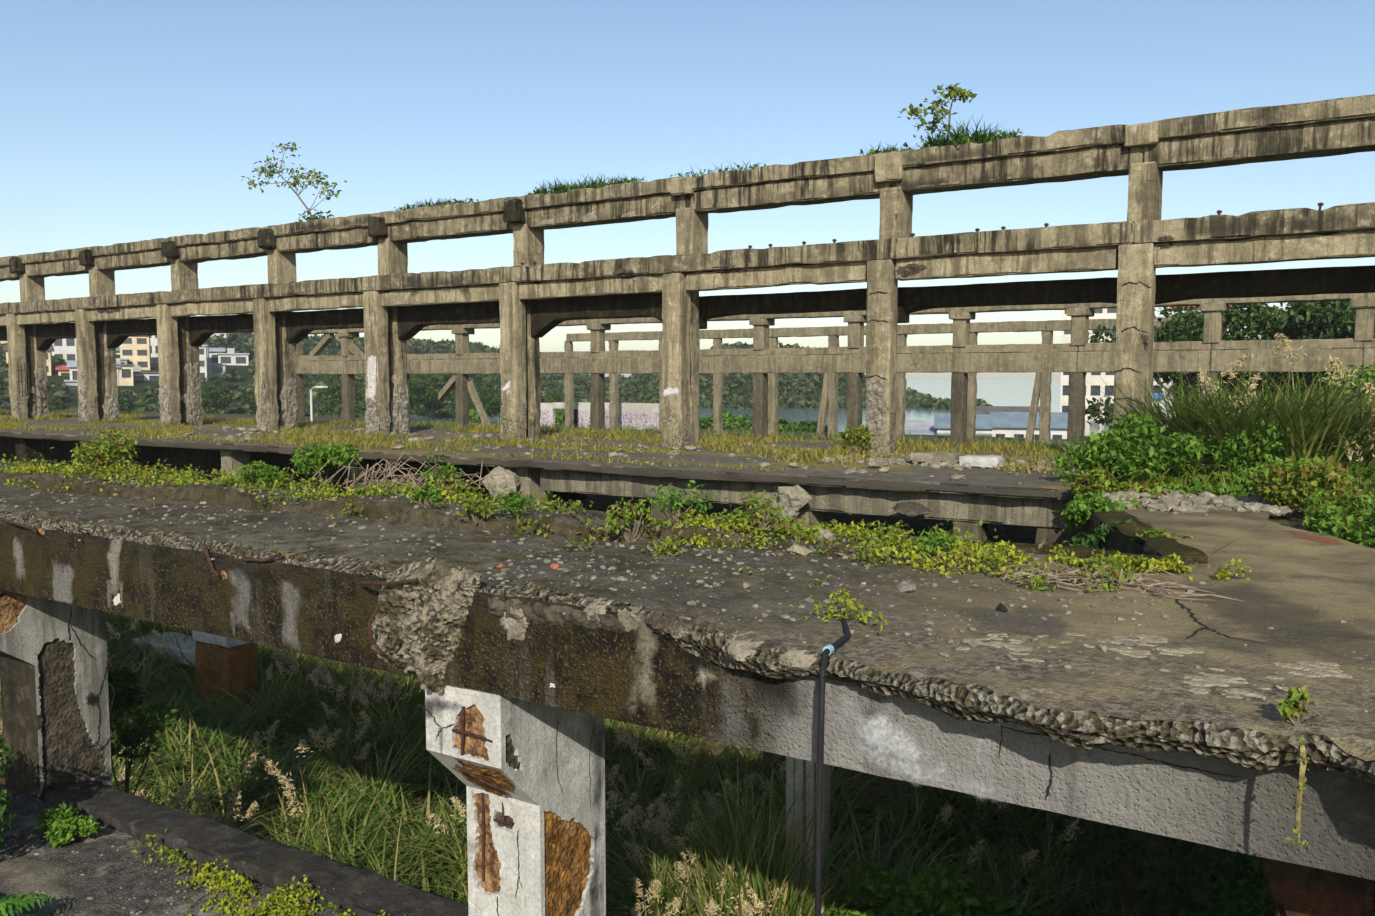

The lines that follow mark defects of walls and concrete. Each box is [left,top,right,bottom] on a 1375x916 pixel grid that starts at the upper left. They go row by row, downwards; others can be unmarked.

crack [1176,599,1269,644]
spalling [37,638,106,793]
crack [932,707,1052,800]
crack [1098,747,1250,780]